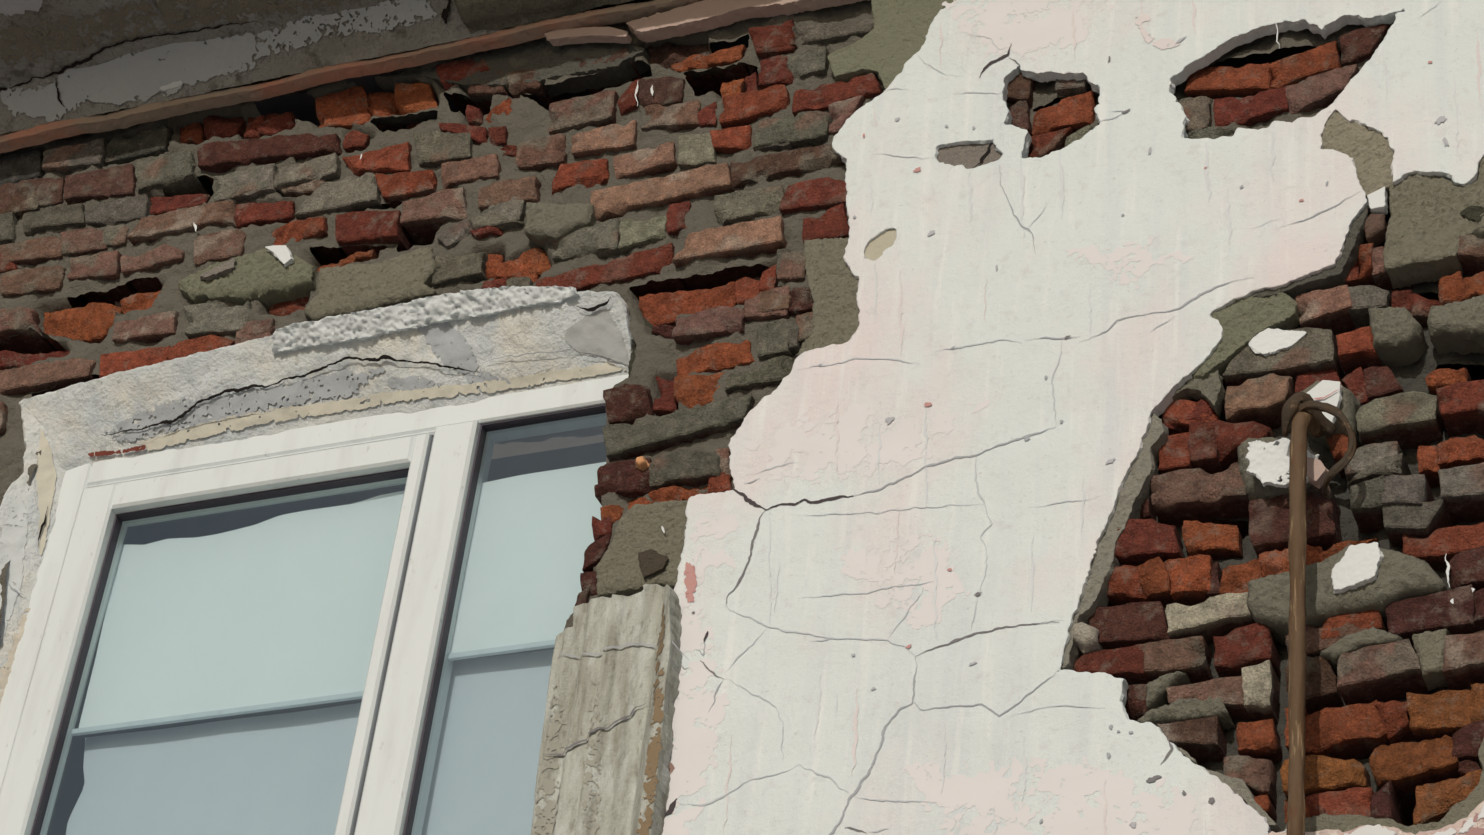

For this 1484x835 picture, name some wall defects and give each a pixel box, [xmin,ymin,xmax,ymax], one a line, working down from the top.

crack [0,21,258,107]
crack [884,34,1020,94]
spalling [937,143,1002,169]
crack [973,142,1048,250]
spalling [1006,72,1100,158]
crack [1253,191,1360,229]
crack [104,297,626,439]
spalling [0,0,956,702]
spalling [1061,23,1484,835]
crack [548,277,1252,835]